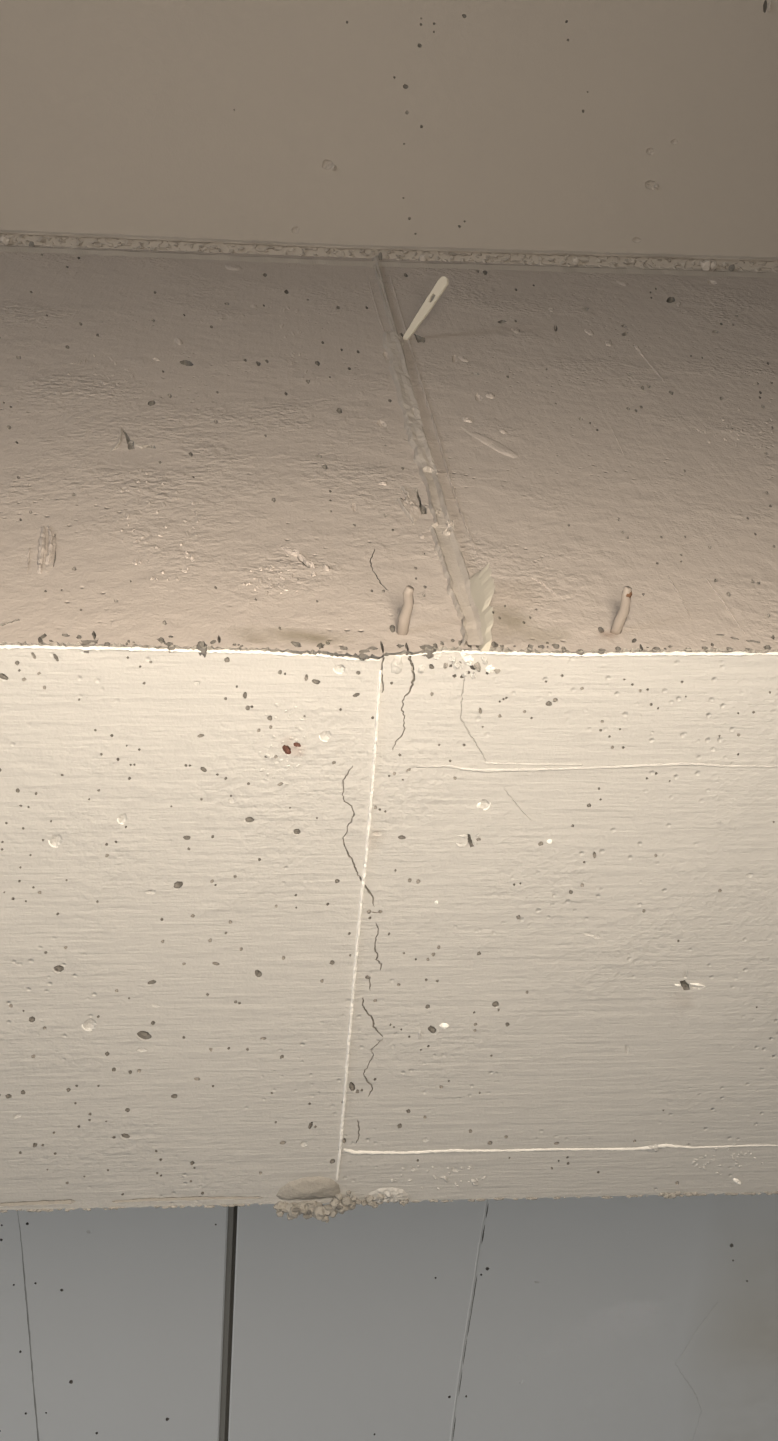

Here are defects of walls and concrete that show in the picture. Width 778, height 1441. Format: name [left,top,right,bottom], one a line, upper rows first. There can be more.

crack [380,654,415,749]
crack [342,766,383,1143]